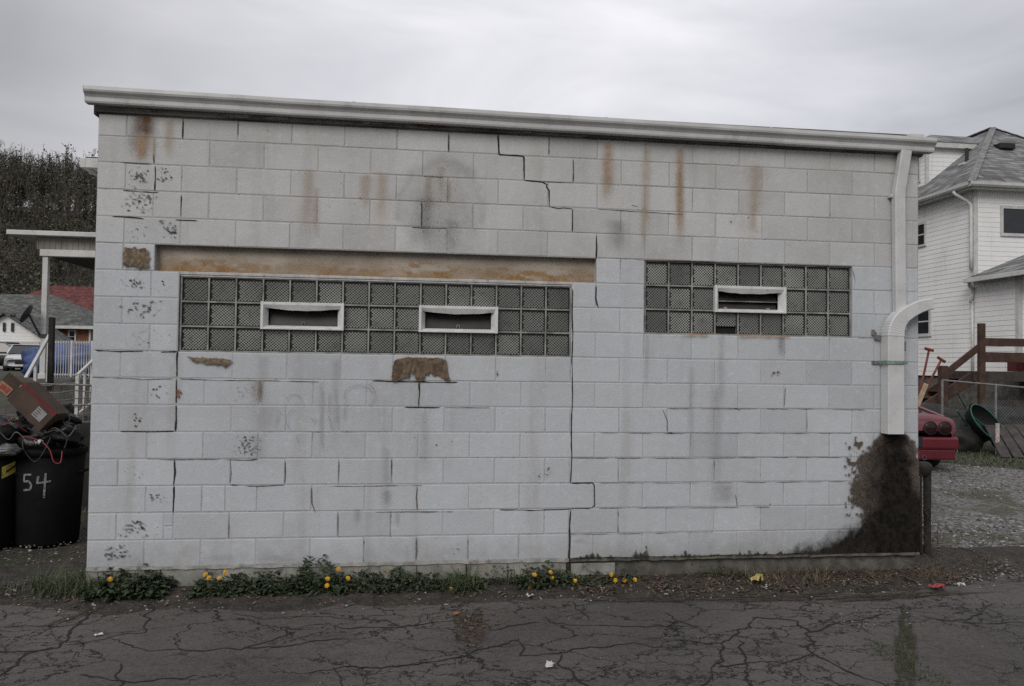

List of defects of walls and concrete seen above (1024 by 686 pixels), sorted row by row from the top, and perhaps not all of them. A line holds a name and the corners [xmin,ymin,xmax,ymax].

spalling [122,168,176,288]
crack [497,136,597,258]
peeling [189,356,232,367]
peeling [391,357,450,382]
crack [501,287,858,577]
crack [378,460,452,537]
water stain [794,431,919,554]